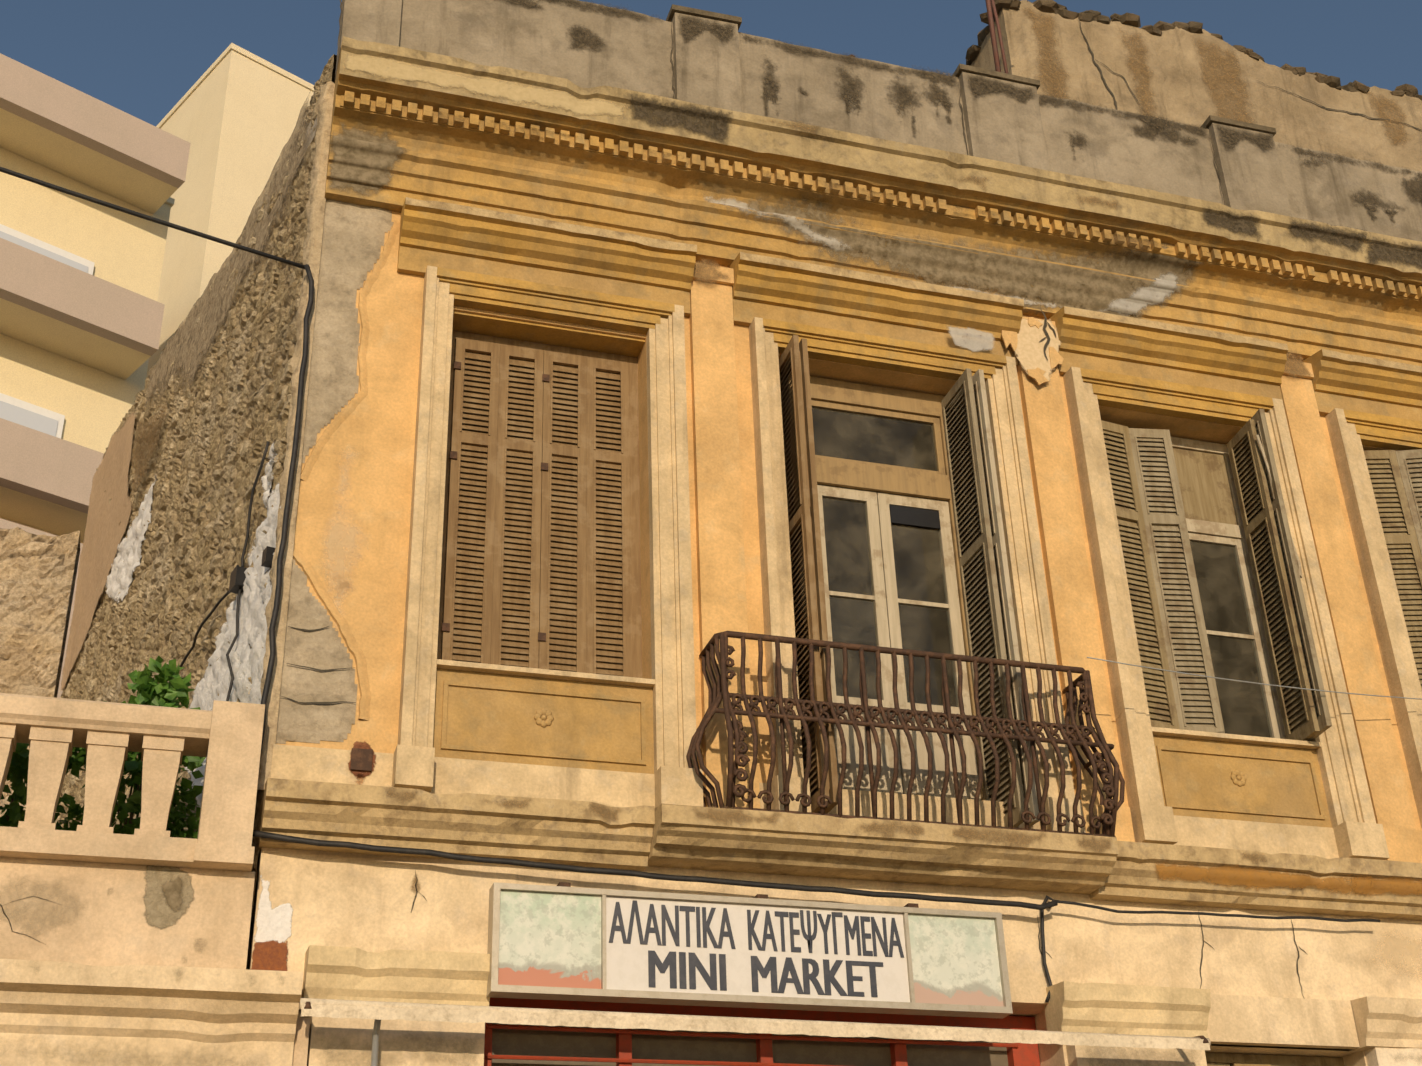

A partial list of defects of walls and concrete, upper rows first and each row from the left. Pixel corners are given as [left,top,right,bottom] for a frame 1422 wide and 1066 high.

water stain [680,9,1274,151]
crack [1078,18,1145,112]
water stain [706,197,1199,318]
mould [1203,209,1260,236]
mould [1289,163,1422,268]
flaking render [61,98,309,690]
spalling [300,200,400,482]
peeling [1001,317,1064,385]
spalling [190,443,372,744]
peeling [250,875,293,971]
crack [1199,918,1215,988]
crack [1291,920,1308,999]